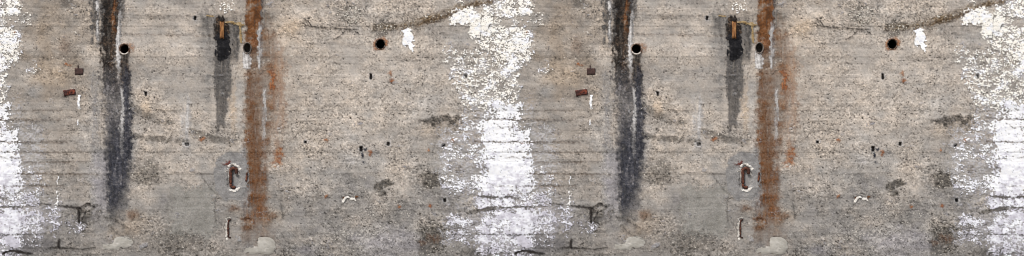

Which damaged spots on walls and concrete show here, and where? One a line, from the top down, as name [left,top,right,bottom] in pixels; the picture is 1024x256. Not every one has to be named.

peeling [0,0,100,256]
leakage [86,0,134,210]
leakage [206,15,239,126]
rust [242,0,284,233]
peeling [419,0,603,256]
leakage [598,0,646,208]
leakage [718,15,751,125]
rust [754,0,796,233]
peeling [931,0,1024,256]